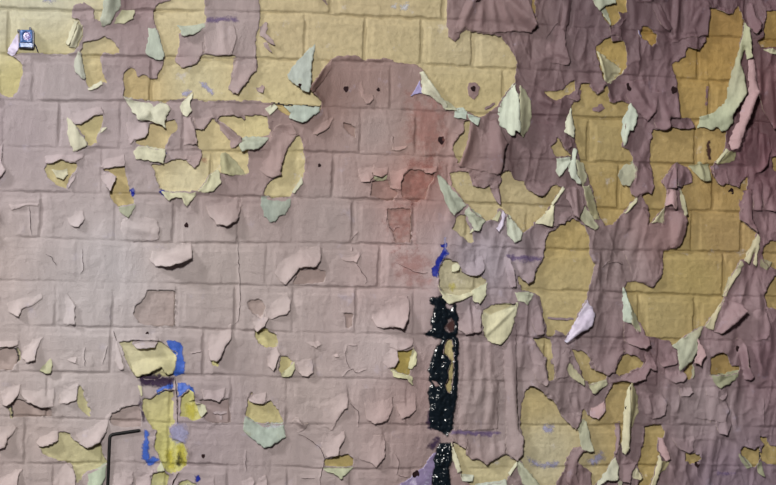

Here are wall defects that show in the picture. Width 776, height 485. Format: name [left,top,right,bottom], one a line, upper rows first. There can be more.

peeling [45,107,107,188]
peeling [98,154,135,218]
peeling [123,0,776,397]
peeling [7,294,43,317]
peeling [63,293,76,325]
peeling [0,337,231,485]
peeling [243,390,386,479]
peeling [364,295,417,424]
peeling [399,452,436,485]
peeling [451,302,671,485]
peeling [691,338,754,423]
peeling [739,436,776,477]